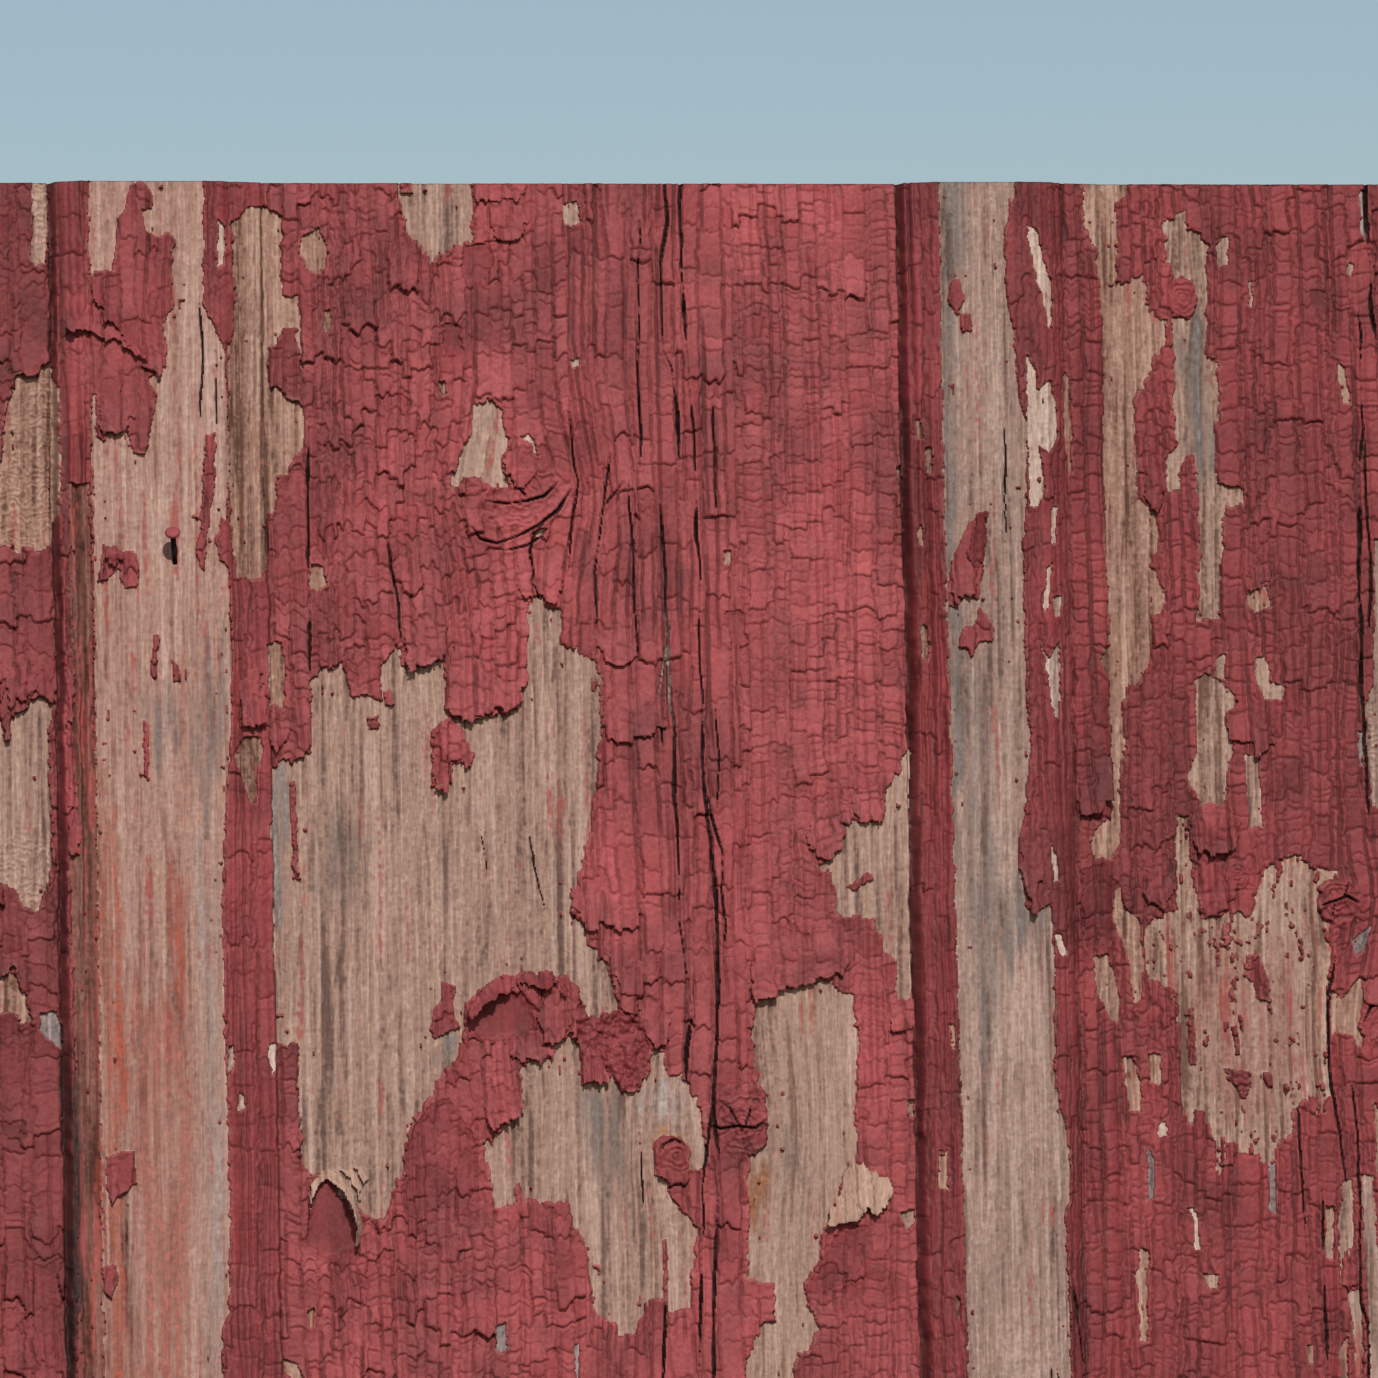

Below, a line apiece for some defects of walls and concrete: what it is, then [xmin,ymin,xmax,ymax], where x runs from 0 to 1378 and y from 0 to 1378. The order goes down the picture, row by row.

peeling [0,181,705,1378]
crack [473,184,766,1378]
peeling [916,182,1073,1378]
peeling [1077,184,1243,860]
peeling [1093,655,1378,1214]
crack [1356,404,1373,815]
crack [1363,184,1371,240]
crack [1358,283,1377,359]
peeling [745,944,915,1378]
peeling [1135,1249,1149,1342]
peeling [1188,1208,1200,1250]
peeling [1325,1103,1378,1378]